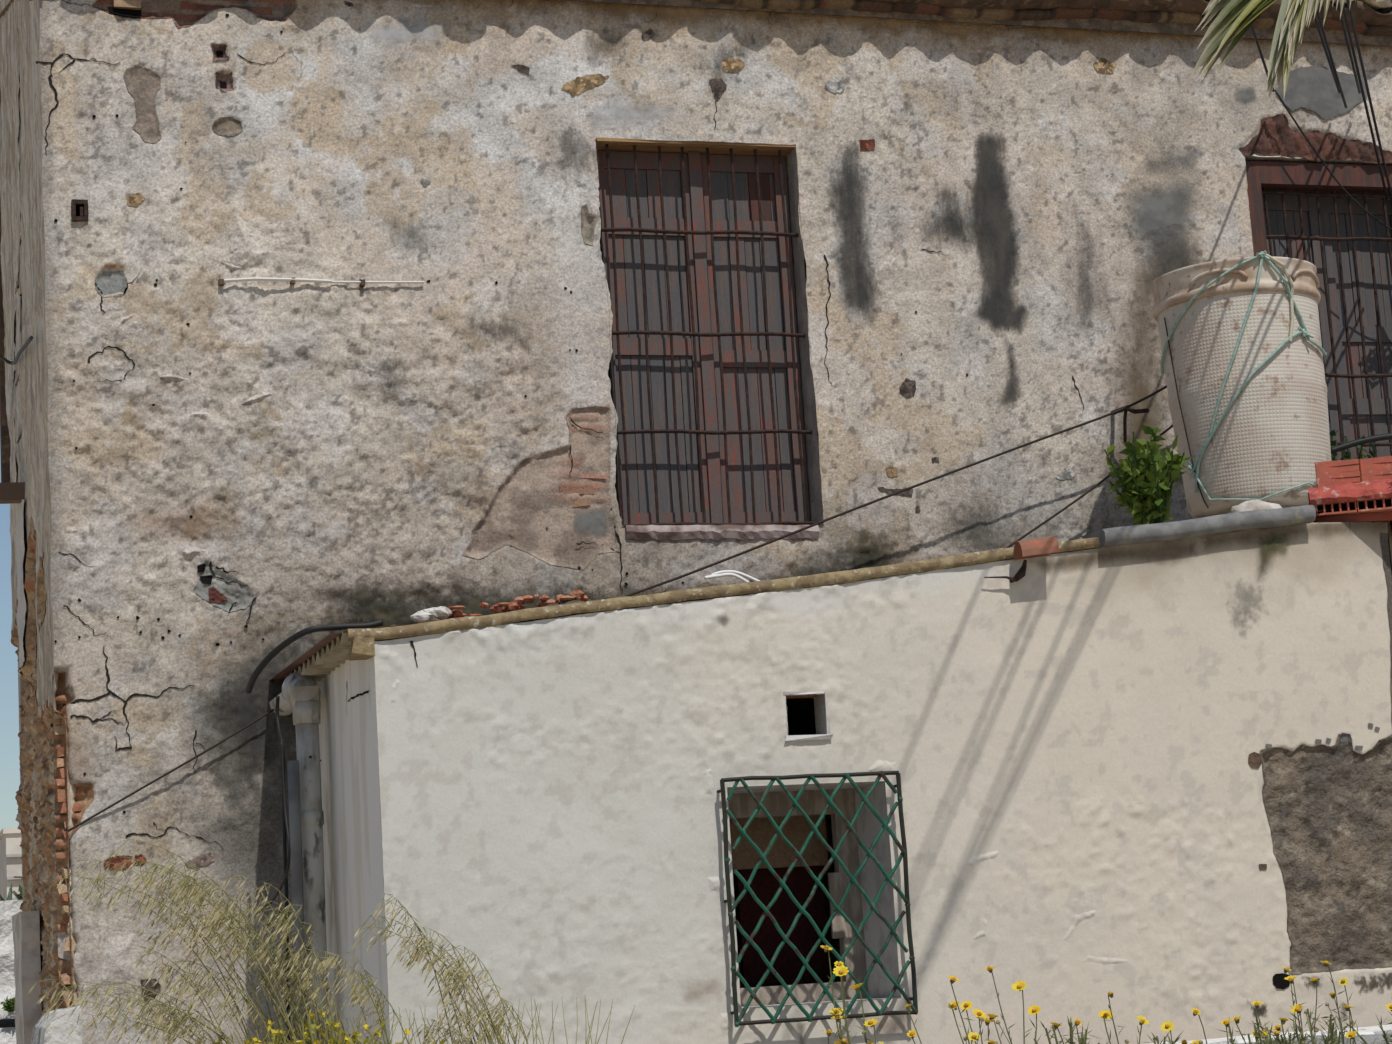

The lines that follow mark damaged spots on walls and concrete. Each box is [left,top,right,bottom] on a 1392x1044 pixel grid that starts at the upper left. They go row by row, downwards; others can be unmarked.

flaking render [92,0,298,28]
flaking render [123,66,162,143]
crack [13,0,120,482]
water stain [833,151,874,312]
water stain [929,135,1026,329]
water stain [1005,346,1018,402]
flaking render [462,407,618,570]
flaking render [193,561,257,625]
flaking render [11,499,94,1015]
crack [50,605,194,752]
water stain [220,647,297,762]
flaking render [1248,723,1392,989]